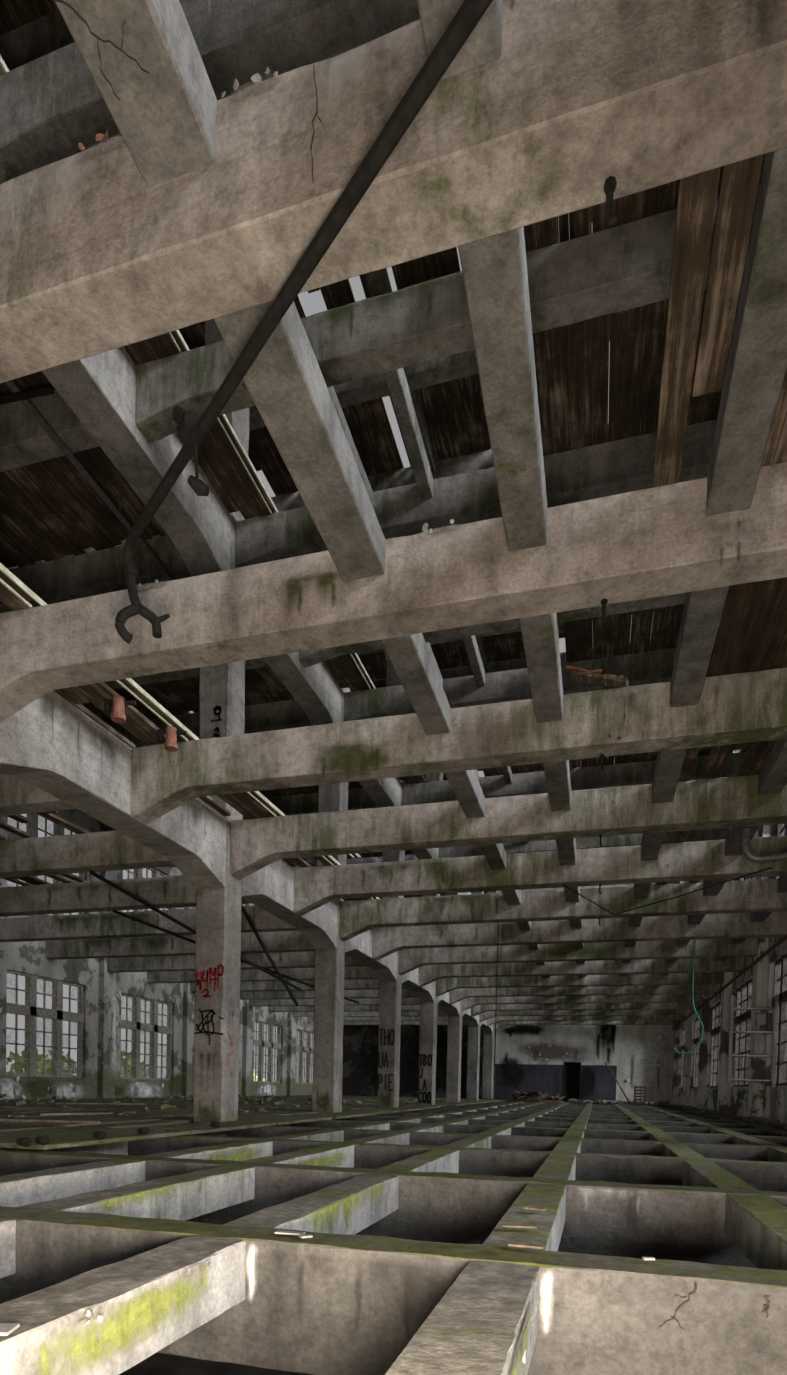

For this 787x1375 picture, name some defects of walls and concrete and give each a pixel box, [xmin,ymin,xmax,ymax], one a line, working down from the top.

crack [52,0,149,101]